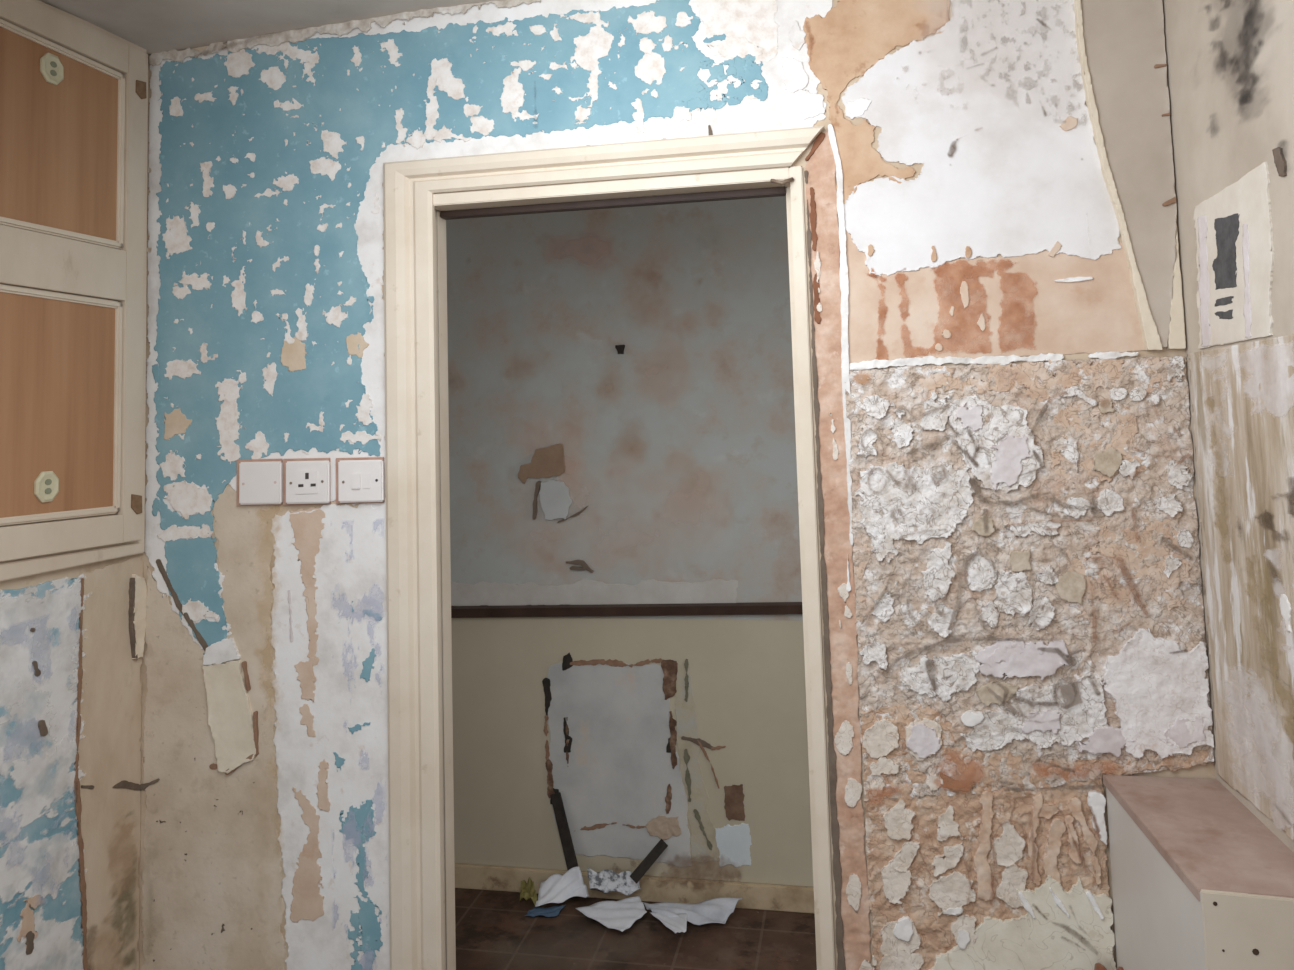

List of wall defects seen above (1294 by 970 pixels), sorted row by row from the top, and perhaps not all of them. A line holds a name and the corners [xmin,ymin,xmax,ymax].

spalling [1059,116,1078,131]
spalling [845,230,1145,364]
peeling [0,0,950,970]
crack [856,391,1209,722]
leakage [87,824,136,970]
peeling [929,875,1117,970]